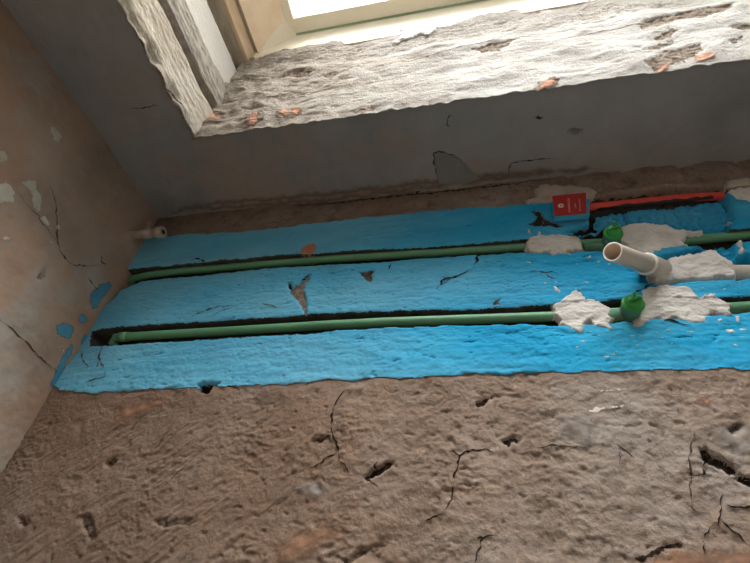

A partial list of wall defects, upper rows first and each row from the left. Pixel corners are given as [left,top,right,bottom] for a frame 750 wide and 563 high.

spalling [471,39,516,53]
spalling [640,3,733,73]
peeling [0,181,15,203]
peeling [22,180,60,230]
crack [22,187,105,289]
crack [0,320,55,369]
crack [310,389,349,472]
crack [426,448,494,521]
crack [688,430,750,556]
crack [472,534,494,563]